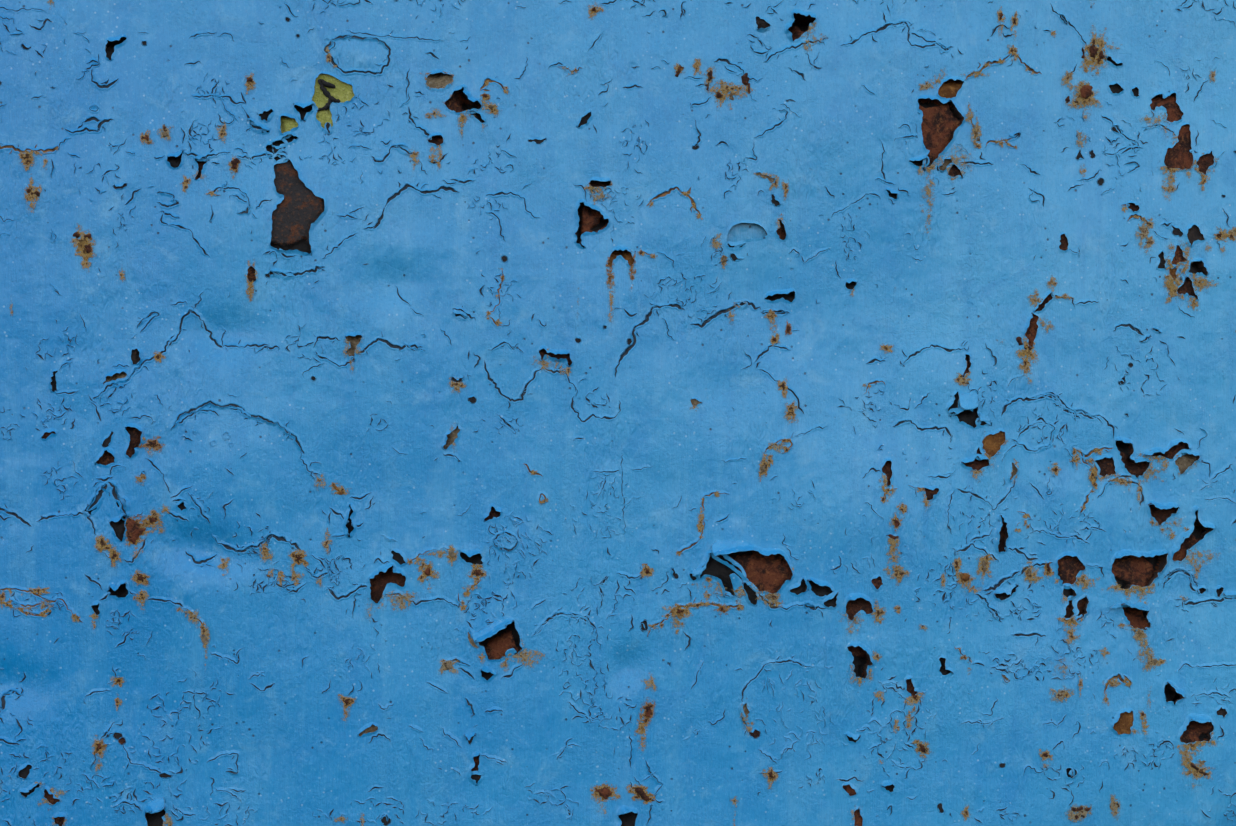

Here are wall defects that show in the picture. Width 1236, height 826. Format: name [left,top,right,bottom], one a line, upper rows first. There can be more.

crack [0,0,541,289]
peeling [247,71,357,256]
crack [479,31,604,100]
rust [674,58,753,109]
crack [593,0,1088,199]
peeling [908,76,972,180]
rust [72,225,95,269]
rust [997,337,1038,382]
rust [94,504,168,610]
peeling [670,540,885,686]
peeling [1054,500,1236,631]
crack [682,655,948,817]